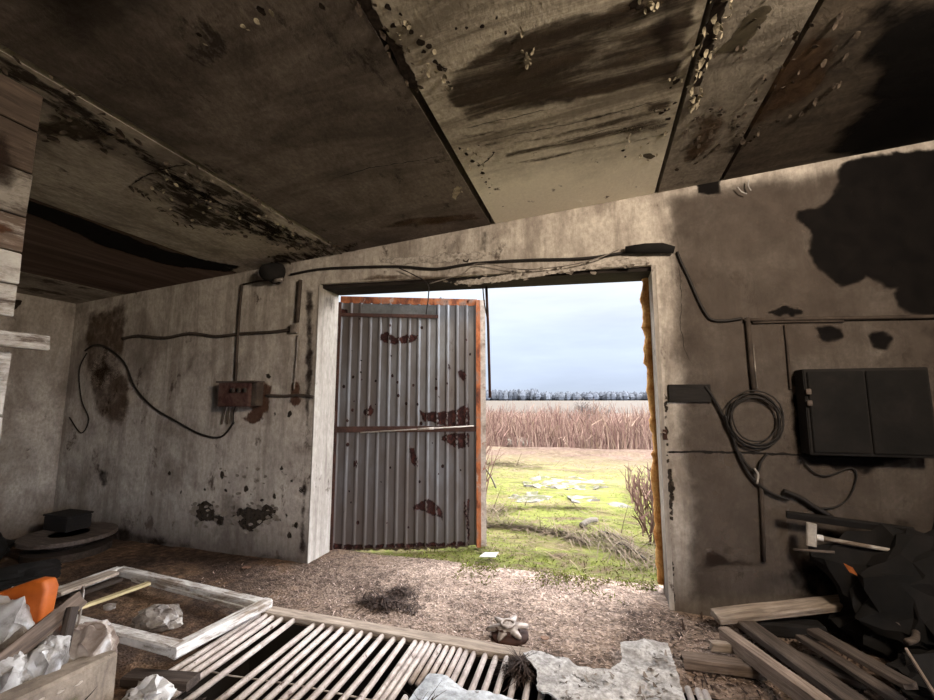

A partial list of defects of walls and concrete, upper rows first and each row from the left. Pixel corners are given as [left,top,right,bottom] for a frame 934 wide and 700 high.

peeling [240,6,274,31]
spalling [350,0,453,93]
leakage [448,0,695,120]
peeling [667,0,772,165]
peeling [38,109,126,155]
leakage [506,101,670,162]
peeling [128,161,365,265]
rust [244,383,272,424]
peeling [188,467,298,538]